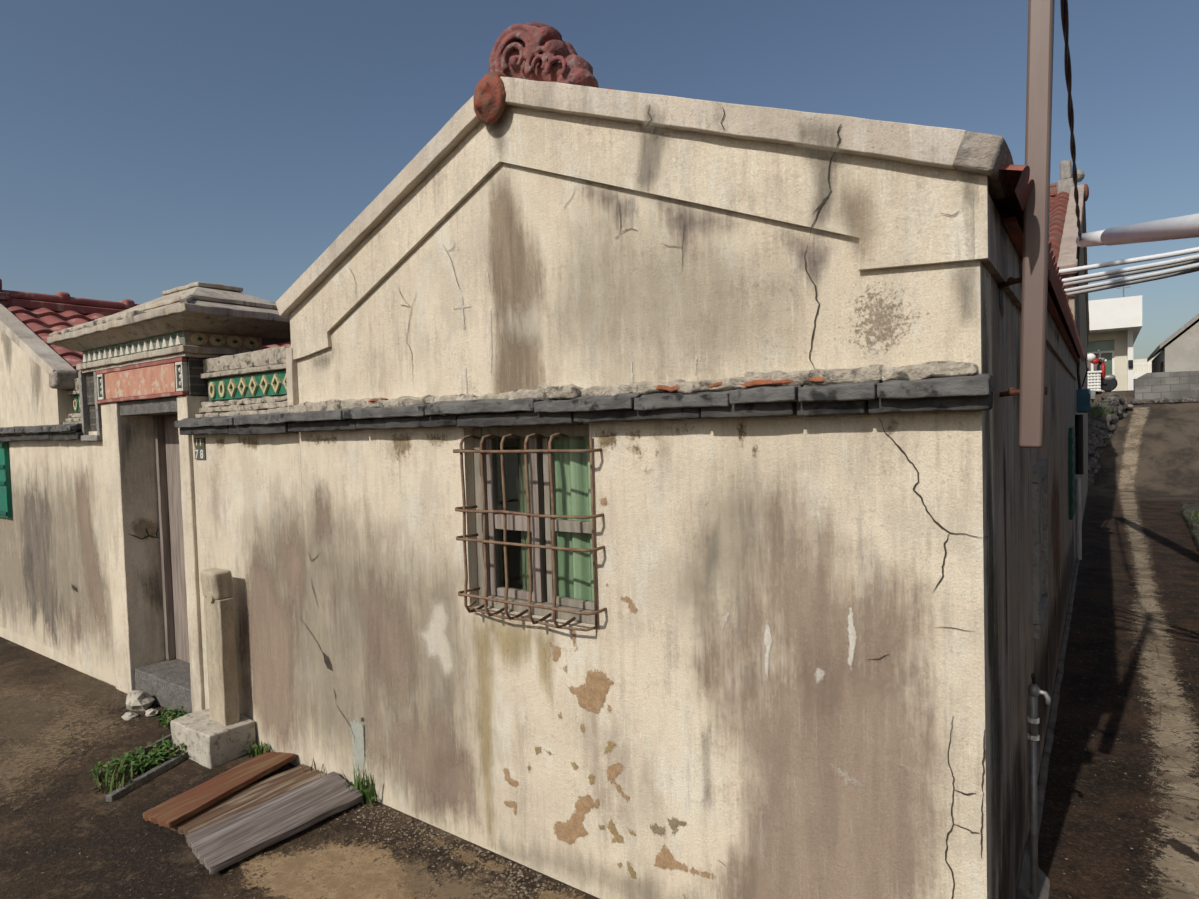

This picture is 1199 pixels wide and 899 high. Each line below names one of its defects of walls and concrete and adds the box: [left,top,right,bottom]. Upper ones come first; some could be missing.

leakage [490,190,540,314]
crack [804,125,841,369]
leakage [496,333,538,394]
leakage [0,483,104,638]
crack [879,418,989,593]
leakage [247,498,489,809]
spalling [420,604,453,676]
peeling [550,630,614,732]
leakage [705,514,932,899]
peeling [553,741,636,844]
peeling [650,817,715,878]
crack [945,719,985,899]